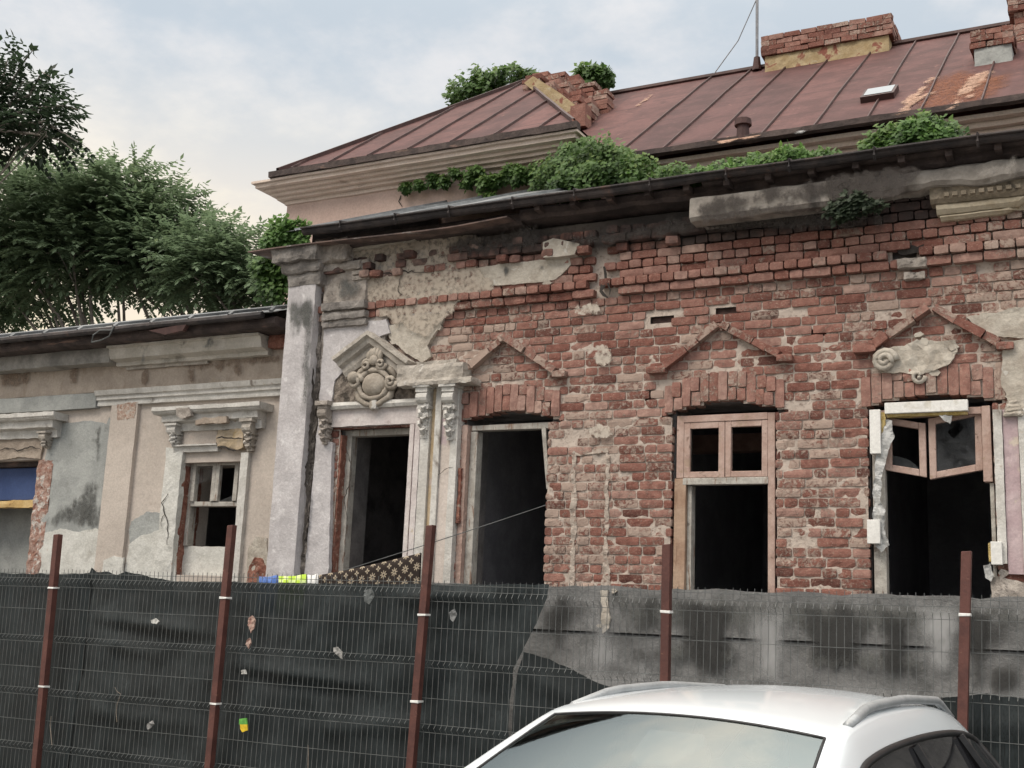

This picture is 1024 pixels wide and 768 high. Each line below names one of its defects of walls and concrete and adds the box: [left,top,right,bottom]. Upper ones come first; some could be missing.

corrosion [900,71,1002,114]
peeling [476,238,582,286]
spalling [897,244,928,282]
spalling [652,316,674,324]
damp [290,300,312,403]
peeling [880,332,960,377]
peeling [966,307,1024,411]
crack [300,294,323,575]
peeling [304,273,455,575]
damp [52,486,97,526]
flaking render [455,468,463,523]
peeling [245,536,268,583]